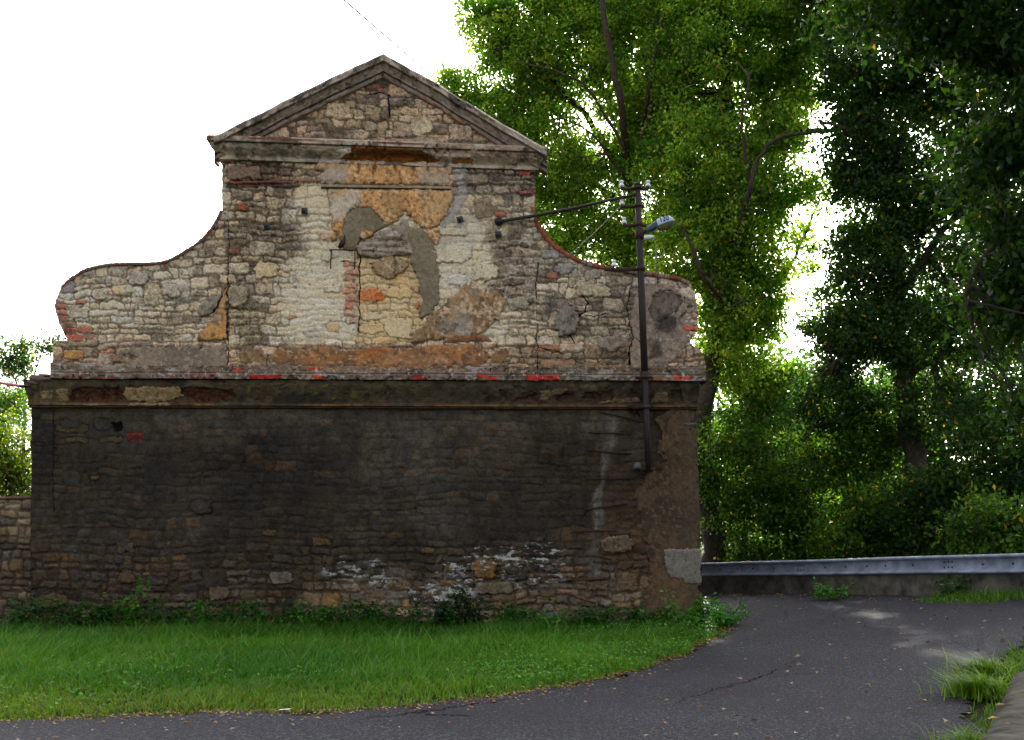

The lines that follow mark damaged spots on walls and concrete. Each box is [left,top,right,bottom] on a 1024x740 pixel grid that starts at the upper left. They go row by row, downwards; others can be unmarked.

peeling [238,159,510,369]
peeling [196,282,229,341]
crack [535,262,640,369]
peeling [40,385,237,407]
peeling [499,388,702,619]
efflorescence [322,560,396,597]
efflorescence [403,542,565,601]